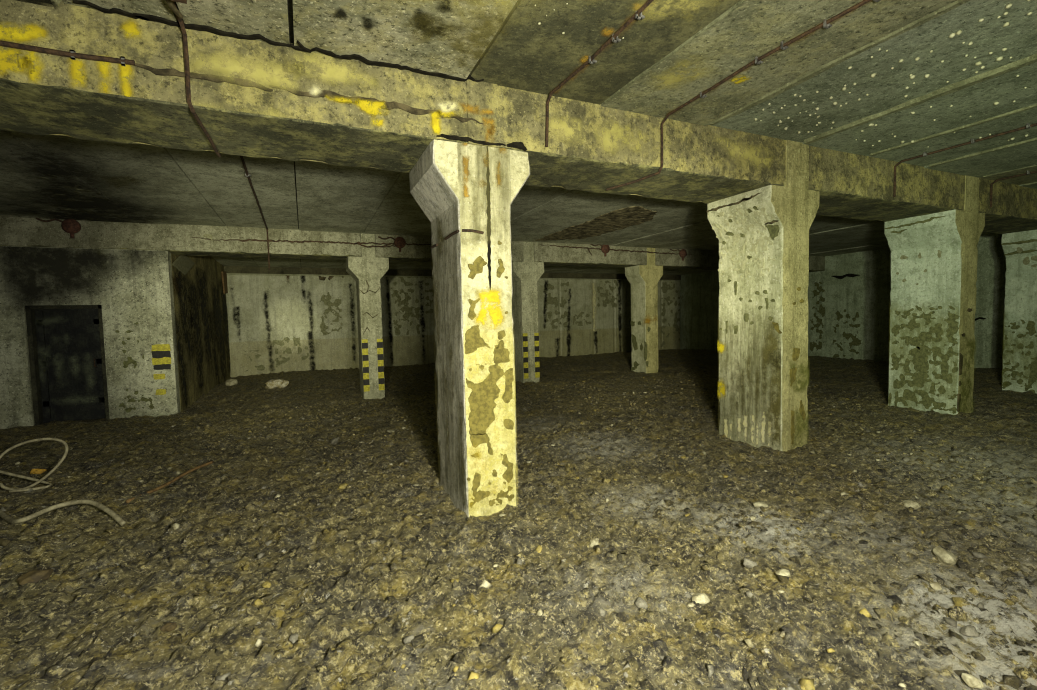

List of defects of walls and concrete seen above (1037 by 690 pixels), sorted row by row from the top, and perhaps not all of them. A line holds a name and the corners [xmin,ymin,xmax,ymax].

crack [73,0,484,82]
damp [194,54,374,95]
damp [410,0,504,66]
crack [133,63,506,290]
spalling [535,206,657,241]
peeling [468,256,508,279]
peeling [888,305,973,414]
peeling [1002,319,1037,393]
peeling [465,298,514,508]